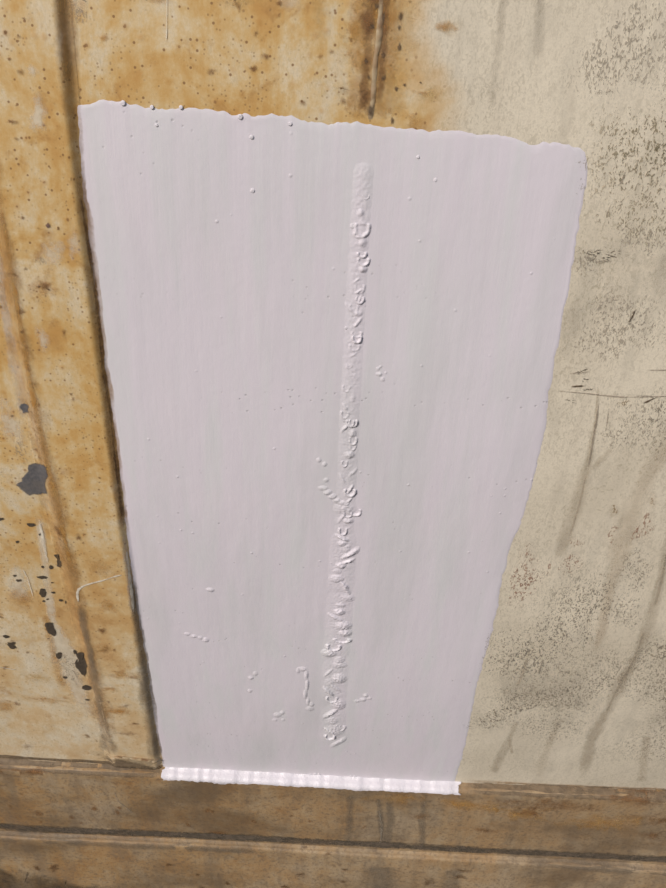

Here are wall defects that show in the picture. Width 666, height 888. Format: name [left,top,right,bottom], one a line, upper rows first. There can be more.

corrosion [59,0,74,72]
corrosion [353,0,396,105]
corrosion [80,187,127,521]
peeling [16,450,48,495]
corrosion [133,593,143,641]
corrosion [141,660,155,710]